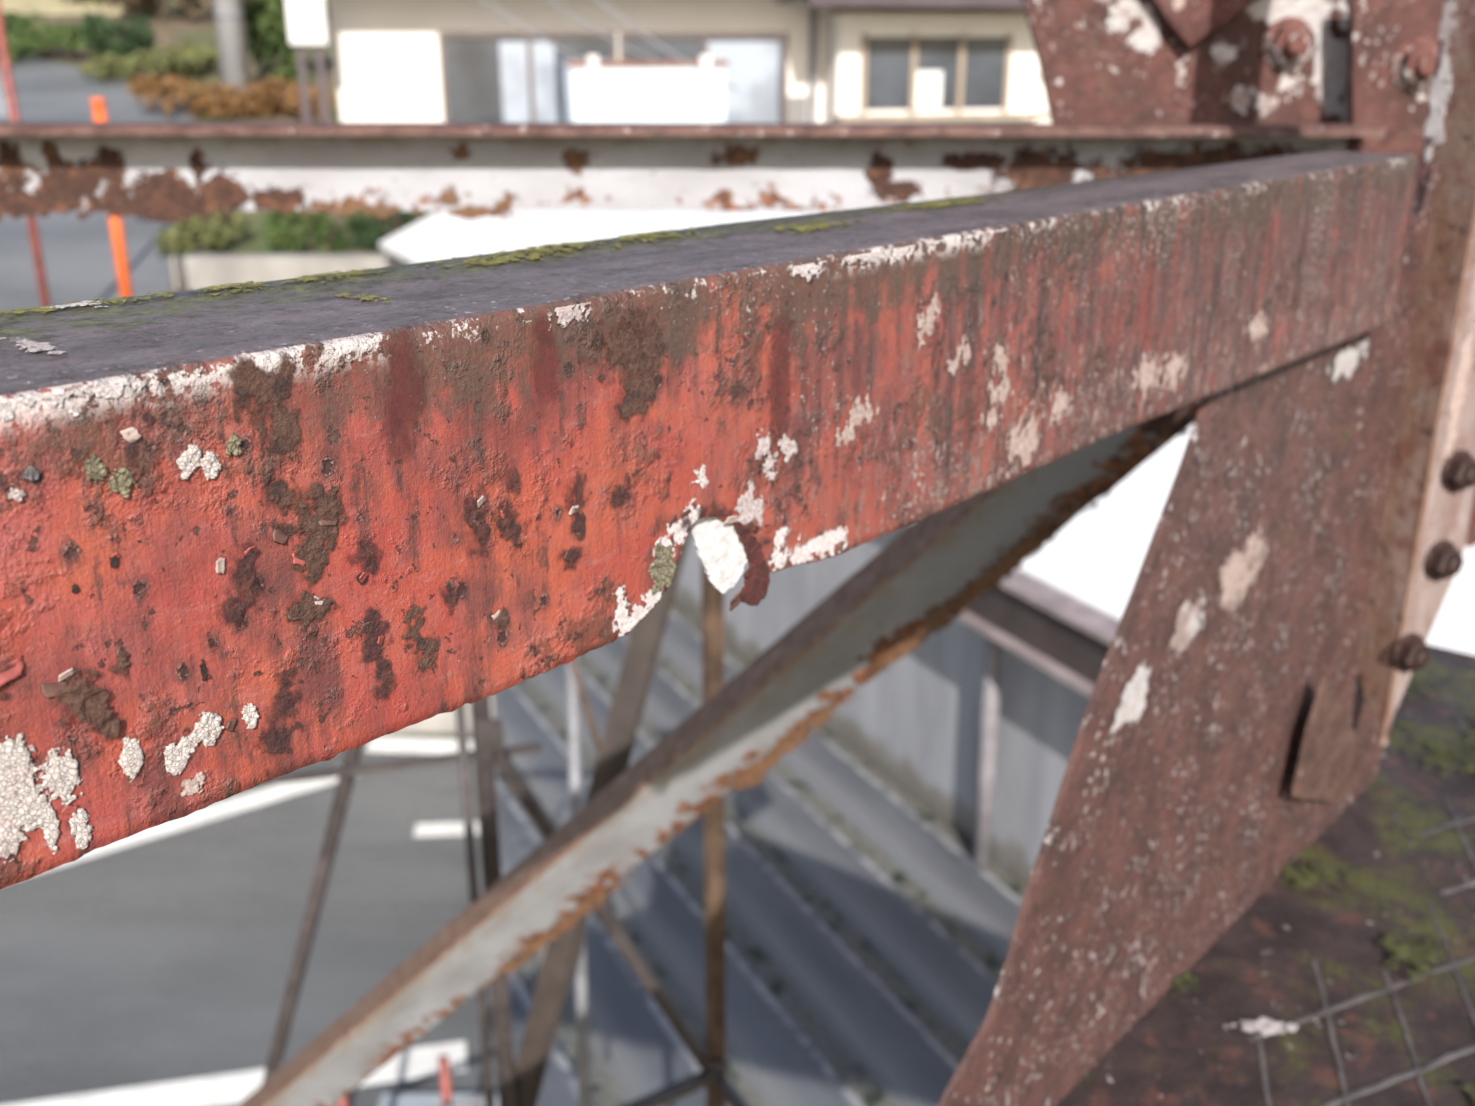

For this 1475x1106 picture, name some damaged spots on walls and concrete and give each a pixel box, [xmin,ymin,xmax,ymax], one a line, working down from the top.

peeling [1245,0,1348,115]
corrosion [0,137,518,224]
corrosion [863,148,924,205]
corrosion [941,140,1329,190]
corrosion [560,472,592,570]
peeling [612,464,709,637]
peeling [724,428,848,571]
corrosion [360,603,441,699]
corrosion [673,484,1115,835]
peeling [1110,660,1152,734]
peeling [0,733,93,863]
peeling [163,703,259,800]